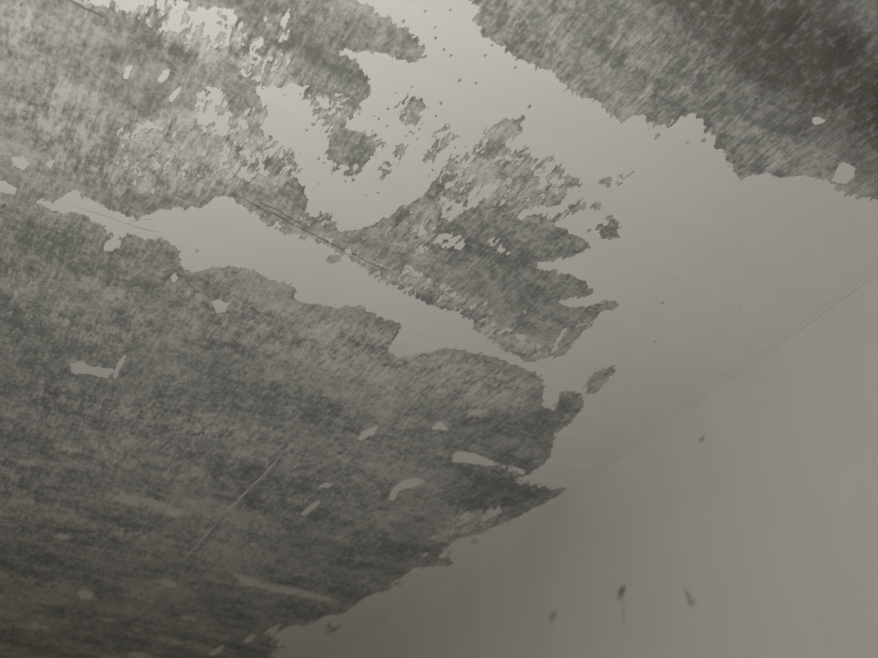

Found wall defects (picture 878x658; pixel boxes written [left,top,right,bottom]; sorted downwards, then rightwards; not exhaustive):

damp [686,0,878,141]